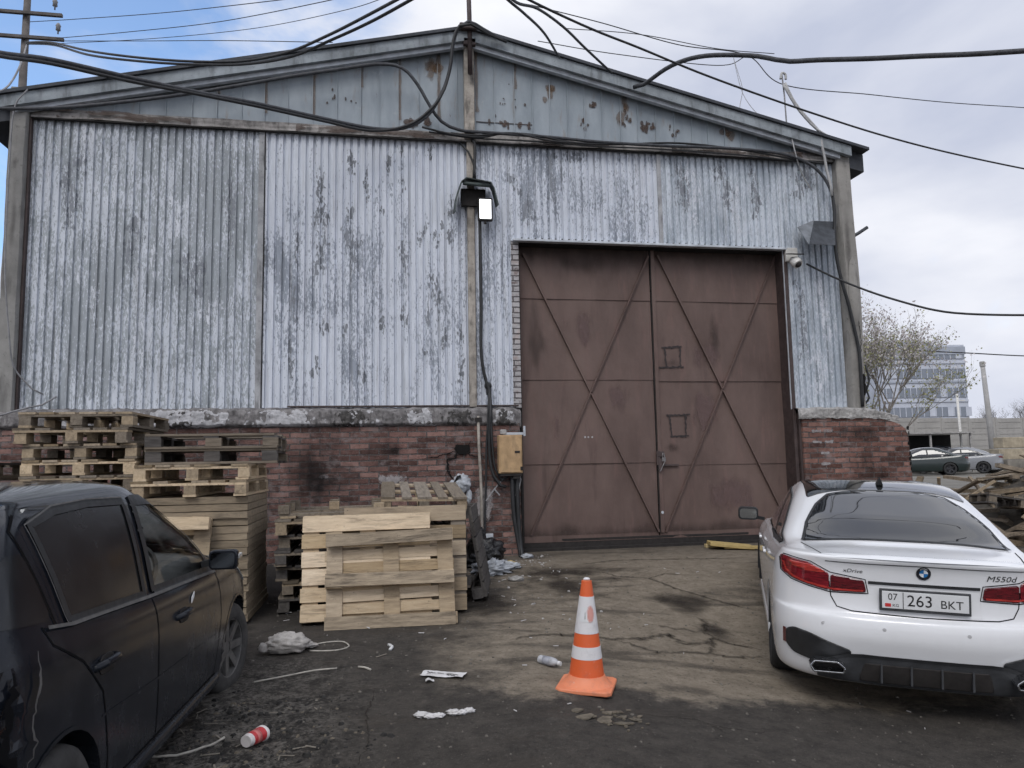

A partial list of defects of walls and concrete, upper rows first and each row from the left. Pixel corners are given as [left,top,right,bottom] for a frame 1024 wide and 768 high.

rust [488,119,531,130]
peeling [44,124,122,250]
peeling [347,150,371,203]
peeling [505,162,536,226]
peeling [665,158,766,240]
peeling [120,210,163,281]
peeling [174,253,224,331]
peeling [244,167,383,428]
peeling [792,264,837,396]
peeling [137,409,229,429]
peeling [400,408,474,426]
spalling [492,408,516,426]